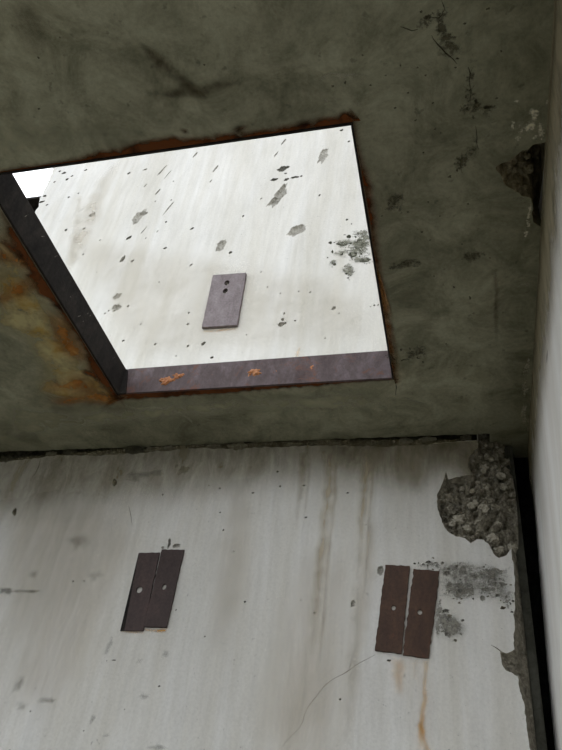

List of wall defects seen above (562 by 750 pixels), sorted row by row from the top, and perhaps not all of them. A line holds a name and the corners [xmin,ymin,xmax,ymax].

corrosion [0,112,398,407]
spalling [496,142,546,223]
spalling [413,434,537,750]